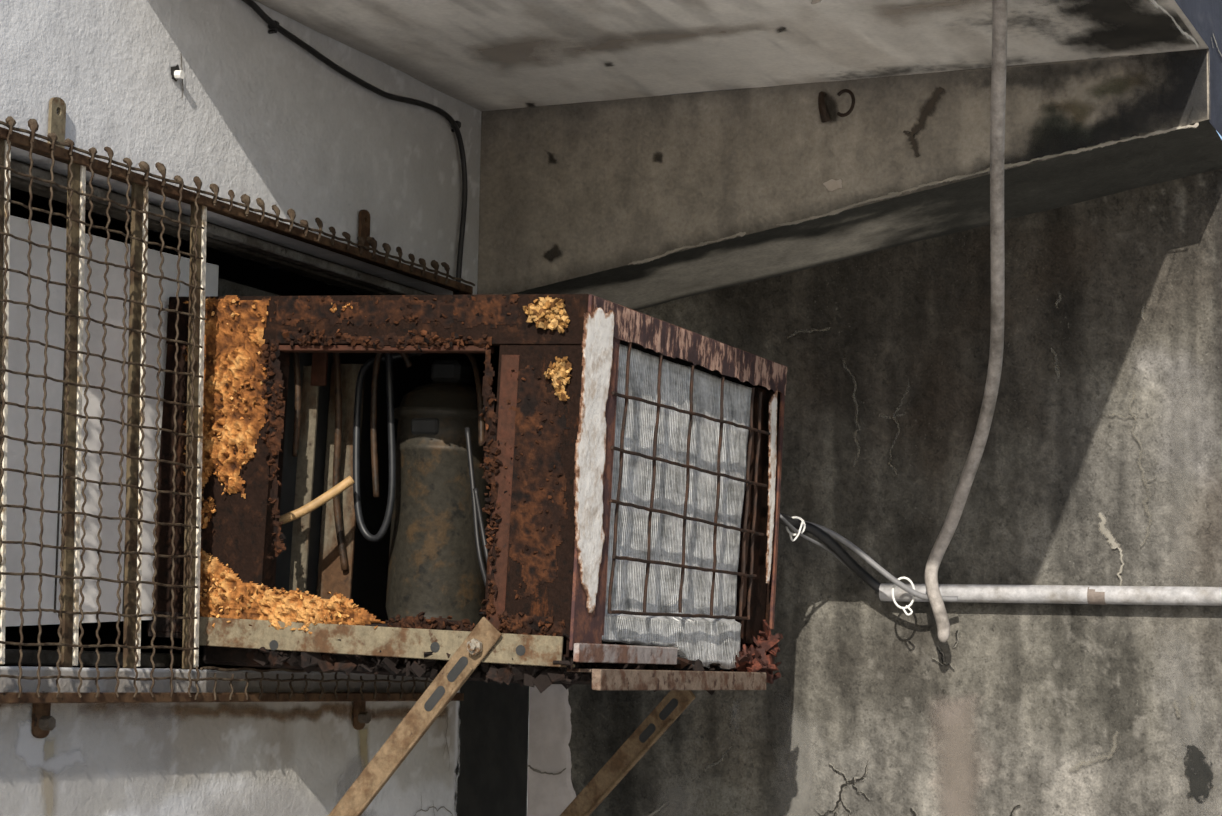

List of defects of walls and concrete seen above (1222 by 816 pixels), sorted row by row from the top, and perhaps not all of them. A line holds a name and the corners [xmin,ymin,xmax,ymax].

leakage [575,31,736,67]
leakage [1004,0,1207,164]
leakage [16,722,84,772]
crack [414,796,453,816]
crack [814,760,870,816]